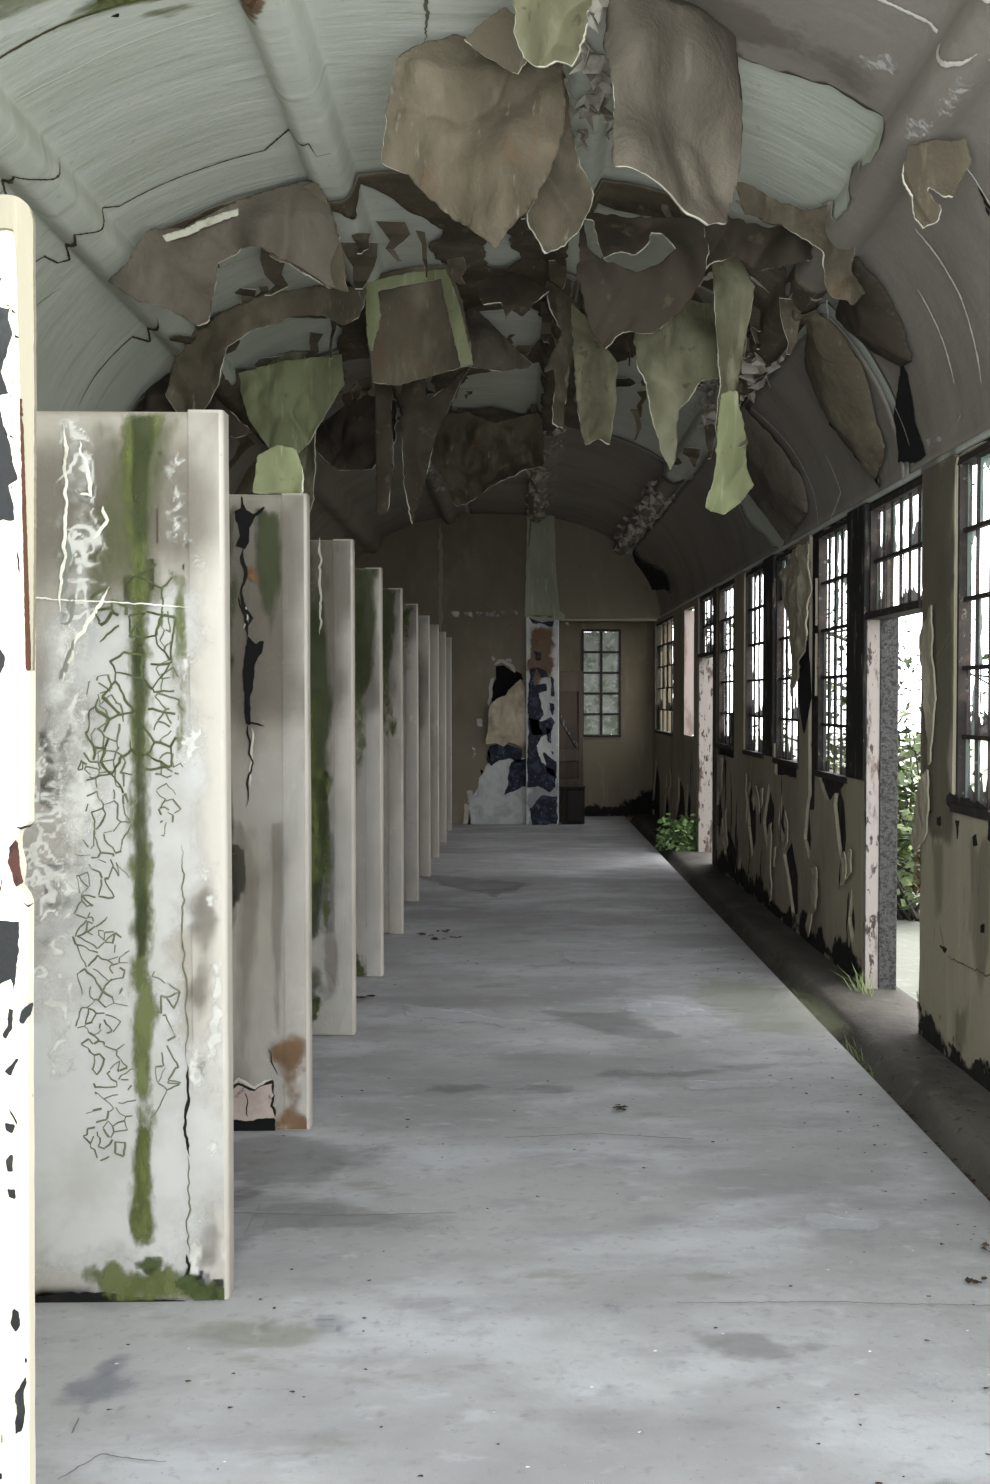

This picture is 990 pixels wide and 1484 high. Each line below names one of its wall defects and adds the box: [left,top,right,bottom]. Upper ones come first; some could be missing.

crack [0,1,212,195]
leakage [79,0,180,15]
crack [878,0,990,68]
peeling [108,0,865,524]
peeling [0,274,20,523]
peeling [0,909,33,1039]
leakage [23,414,224,1278]
crack [72,563,191,1275]
crack [234,496,265,806]
leakage [310,557,332,937]
peeling [463,616,569,825]
peeling [15,1358,27,1434]